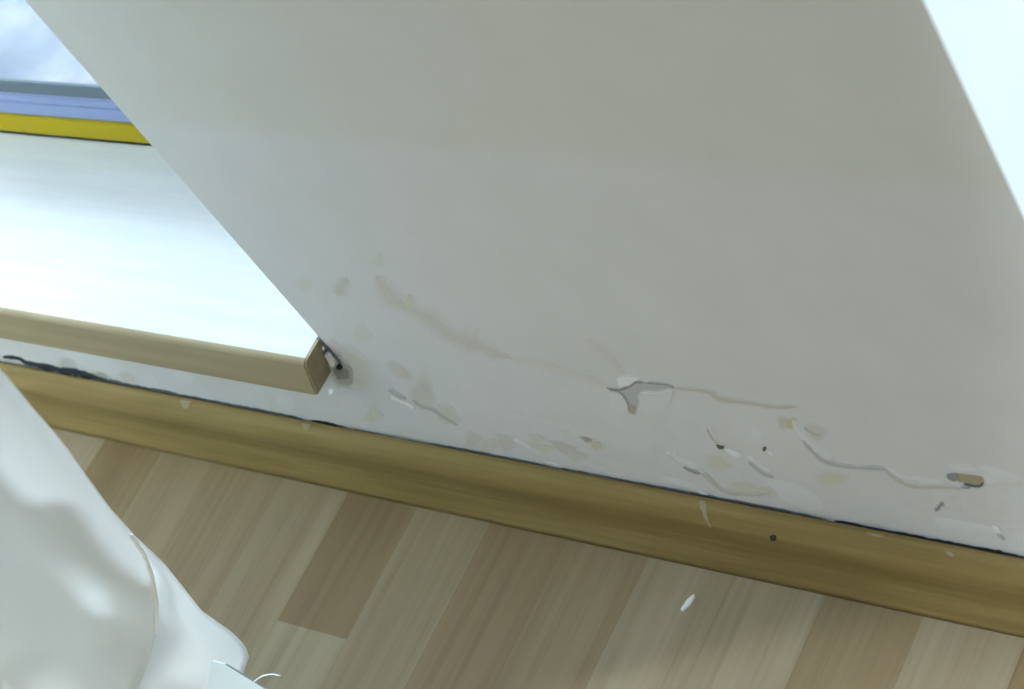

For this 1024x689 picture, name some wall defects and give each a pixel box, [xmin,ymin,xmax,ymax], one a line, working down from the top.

peeling [610,376,669,413]
crack [2,355,1024,558]
spalling [947,473,984,488]